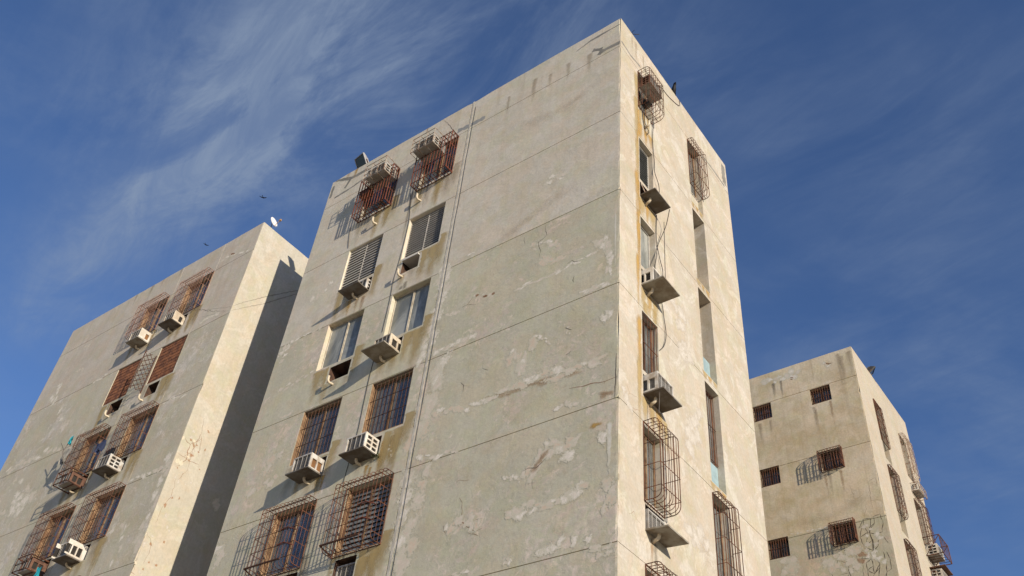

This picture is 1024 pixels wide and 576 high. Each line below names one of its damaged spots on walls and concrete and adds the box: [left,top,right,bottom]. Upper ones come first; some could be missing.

corrosion [634,74,661,425]
crack [131,420,204,574]
peeling [386,257,618,576]